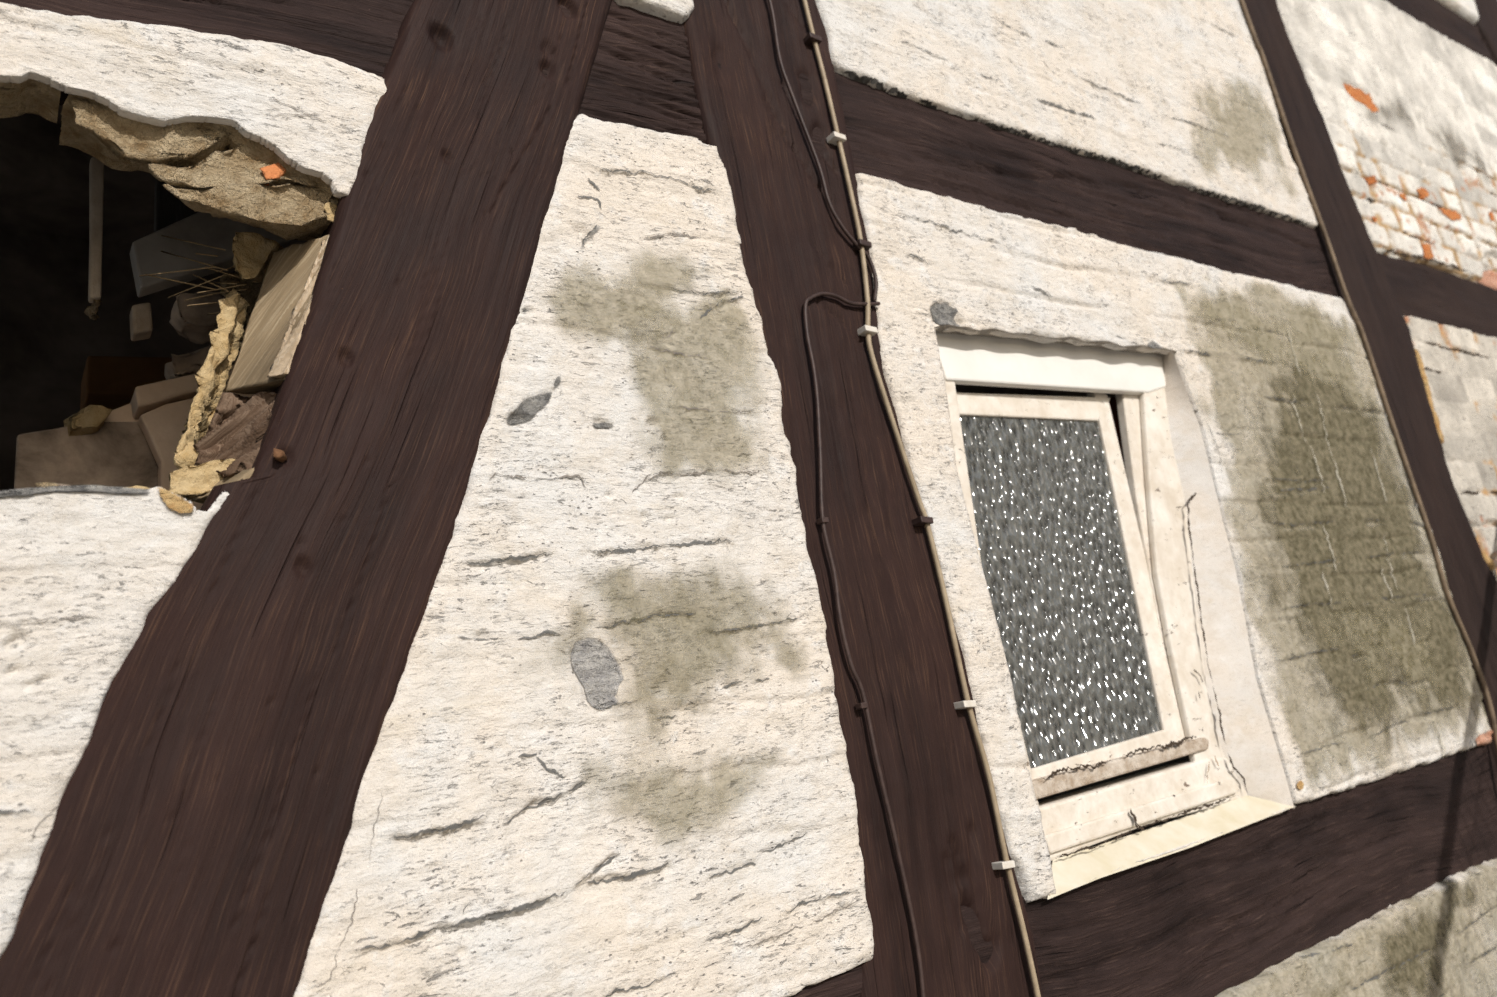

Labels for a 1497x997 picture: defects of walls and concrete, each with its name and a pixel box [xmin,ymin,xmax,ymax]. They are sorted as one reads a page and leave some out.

water stain [1200,84,1282,171]
spalling [1343,83,1379,112]
spalling [1399,187,1462,221]
spalling [0,79,339,513]
spalling [1421,243,1434,260]
spalling [1478,269,1497,290]
water stain [555,258,750,470]
water stain [1192,284,1488,790]
water stain [1482,552,1495,571]
spalling [571,638,623,710]
water stain [603,570,753,713]
water stain [627,769,739,827]